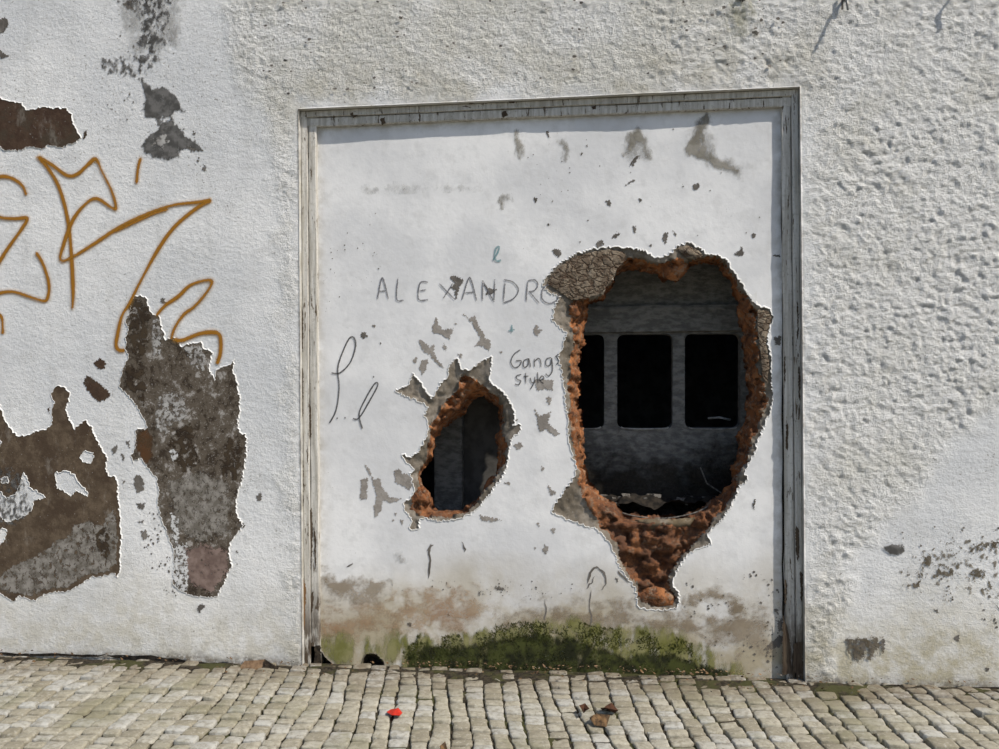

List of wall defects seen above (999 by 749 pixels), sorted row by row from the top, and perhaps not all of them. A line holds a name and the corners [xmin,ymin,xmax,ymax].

peeling [0,97,87,152]
peeling [450,275,464,299]
peeling [0,294,262,613]
spalling [360,314,523,531]
spalling [534,230,781,618]
flaking render [737,571,783,668]
peeling [899,536,999,628]